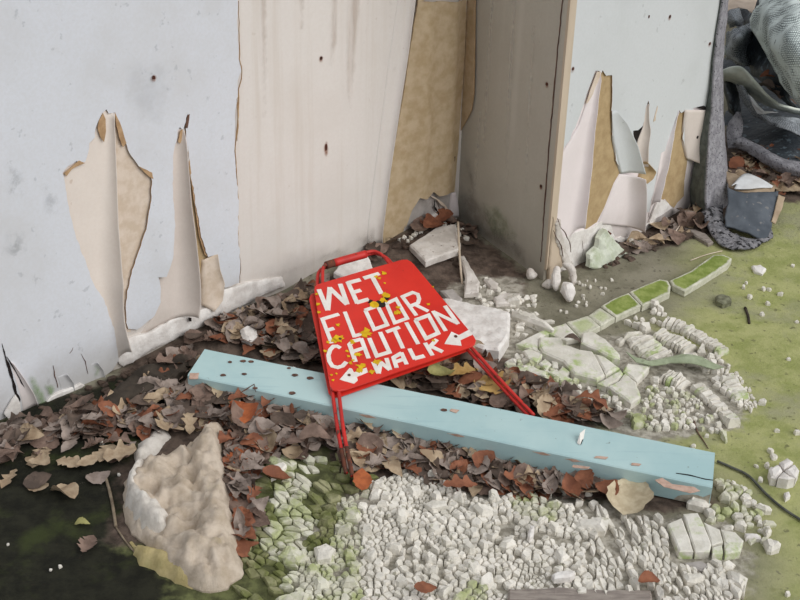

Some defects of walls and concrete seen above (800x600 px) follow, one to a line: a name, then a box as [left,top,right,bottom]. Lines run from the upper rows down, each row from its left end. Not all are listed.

peeling [4,110,285,418]
spalling [403,192,459,232]
peeling [546,71,706,279]
crack [2,344,24,402]